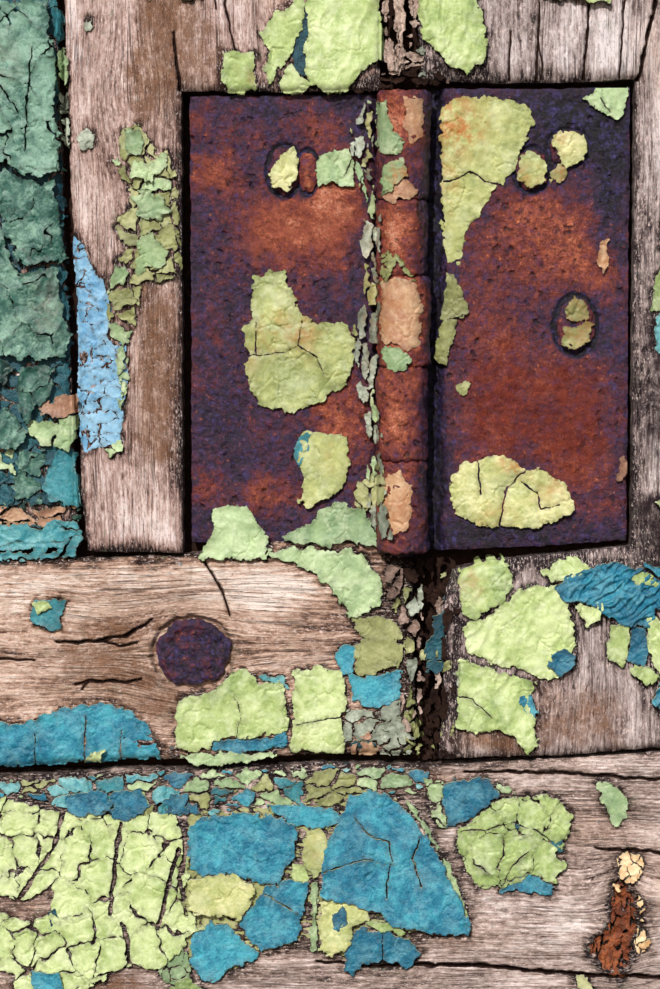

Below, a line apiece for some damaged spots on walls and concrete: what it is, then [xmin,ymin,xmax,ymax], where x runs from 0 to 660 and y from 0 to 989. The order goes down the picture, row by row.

peeling [582,87,629,120]
peeling [0,0,183,562]
peeling [221,0,488,444]
peeling [434,95,588,366]
peeling [561,296,595,350]
peeling [597,238,610,274]
peeling [650,270,660,354]
crack [204,561,230,616]
corrosion [65,622,166,713]